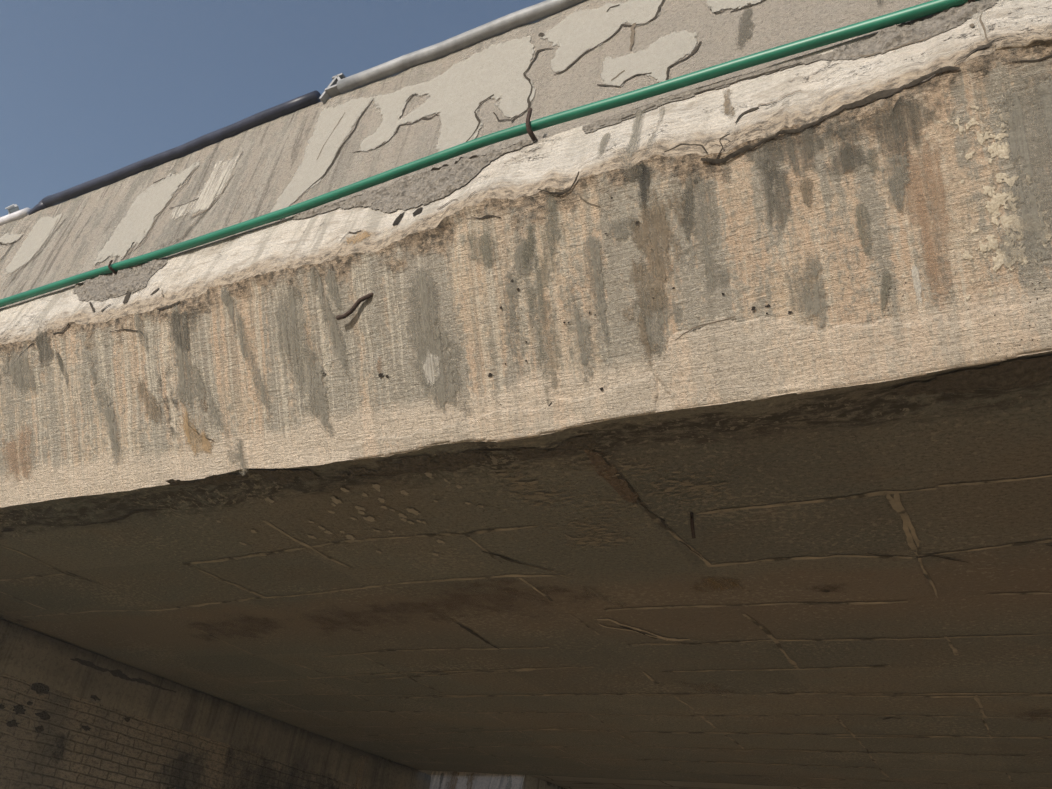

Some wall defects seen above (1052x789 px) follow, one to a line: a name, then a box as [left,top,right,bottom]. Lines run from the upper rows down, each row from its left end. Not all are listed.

peeling [73,158,237,312]
damp [168,304,244,475]
peeling [267,0,702,226]
damp [500,194,610,405]
crack [538,171,600,207]
damp [619,111,653,214]
peeling [350,189,1052,460]
spalling [582,0,997,133]
damp [745,95,939,228]
crack [70,658,176,693]
crack [457,623,501,650]
crack [597,619,690,641]